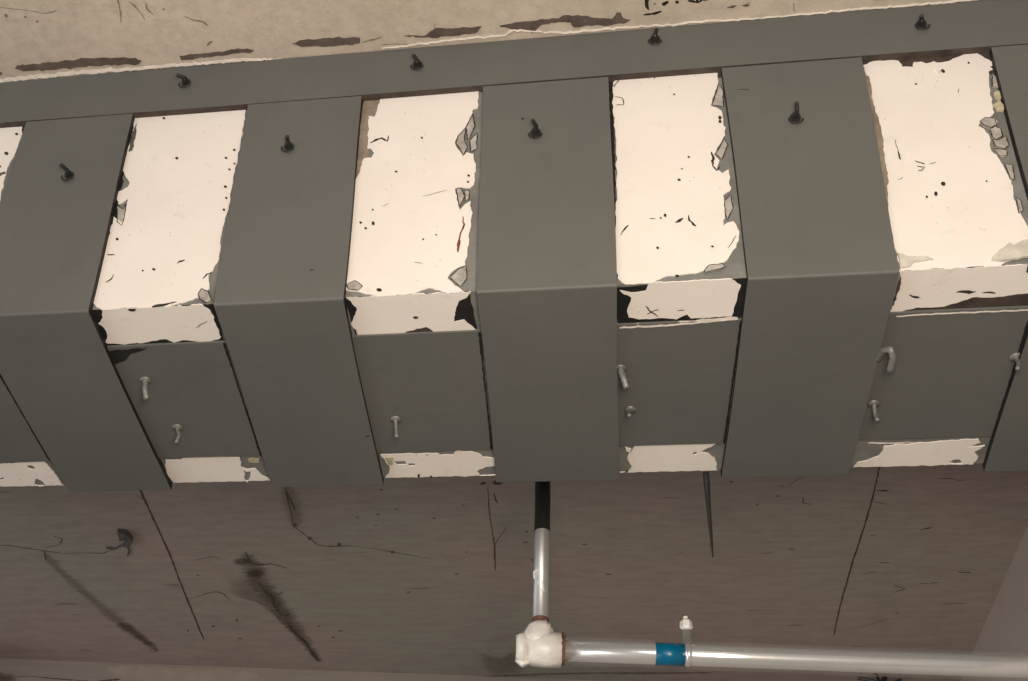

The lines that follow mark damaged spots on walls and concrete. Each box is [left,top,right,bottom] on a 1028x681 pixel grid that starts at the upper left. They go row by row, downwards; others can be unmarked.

peeling [0,127,22,201]
peeling [94,110,246,345]
peeling [346,91,479,335]
peeling [612,73,741,319]
peeling [863,53,1028,312]
crack [2,536,111,560]
crack [136,490,229,639]
peeling [165,457,270,483]
crack [285,488,425,558]
peeling [379,450,496,491]
crack [833,467,971,636]
peeling [853,438,985,467]